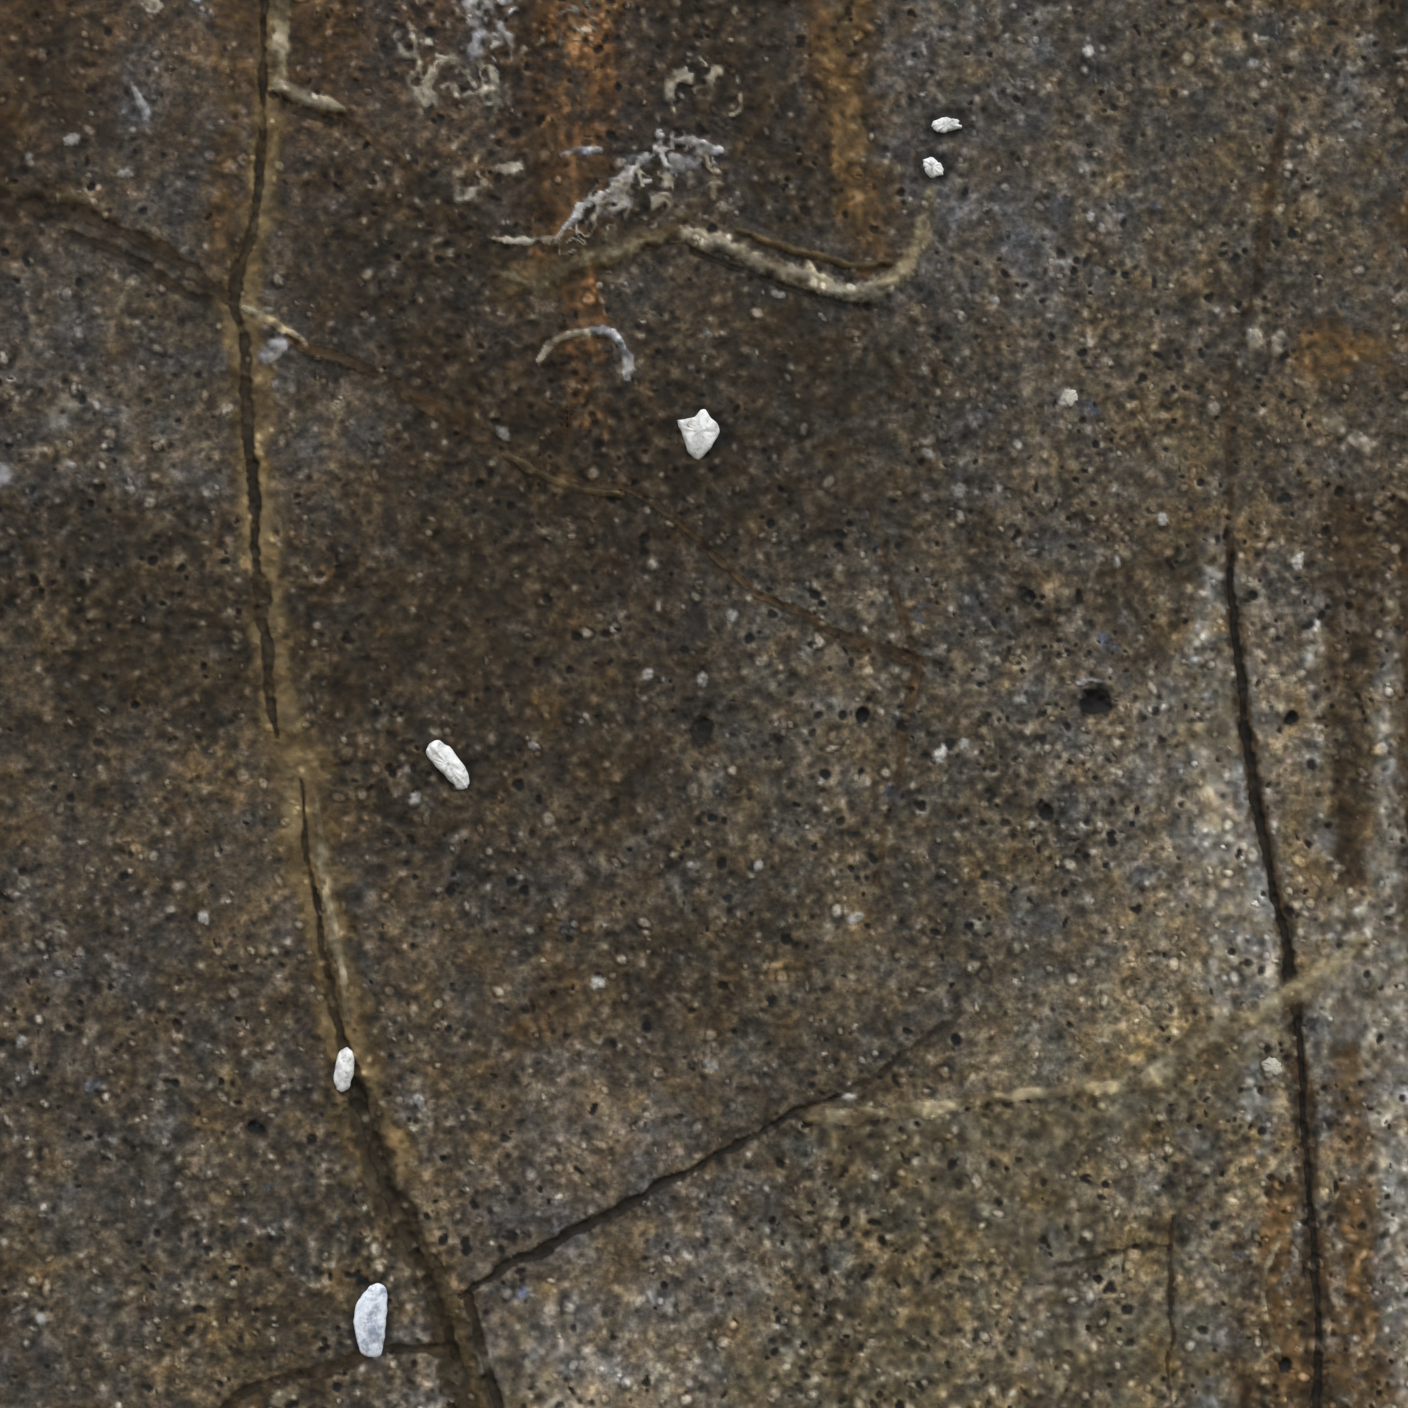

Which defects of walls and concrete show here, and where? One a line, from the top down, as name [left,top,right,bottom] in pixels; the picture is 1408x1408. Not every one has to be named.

rust [807,0,895,276]
rust [1290,313,1400,380]
crack [0,0,962,1408]
crack [1224,104,1332,1408]
rust [1388,501,1408,678]
rust [1397,713,1408,870]